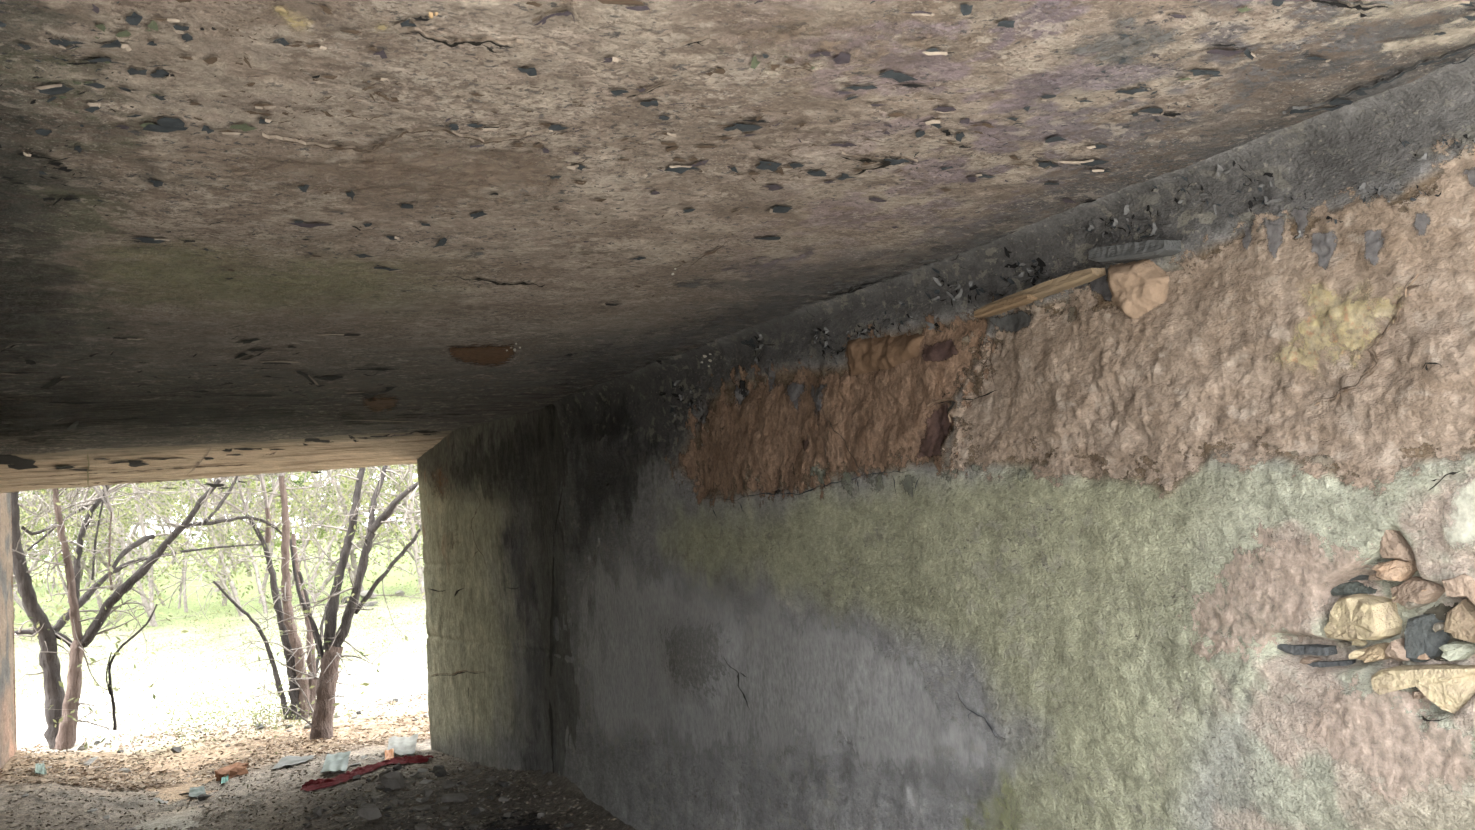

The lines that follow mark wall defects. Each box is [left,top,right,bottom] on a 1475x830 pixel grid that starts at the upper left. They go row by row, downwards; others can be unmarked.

peeling [1316,0,1475,28]
peeling [0,0,1263,297]
spalling [656,134,1475,507]
peeling [172,325,437,447]
peeling [0,454,182,471]
peeling [203,448,284,460]
spalling [1423,602,1467,661]
spalling [1305,673,1475,805]